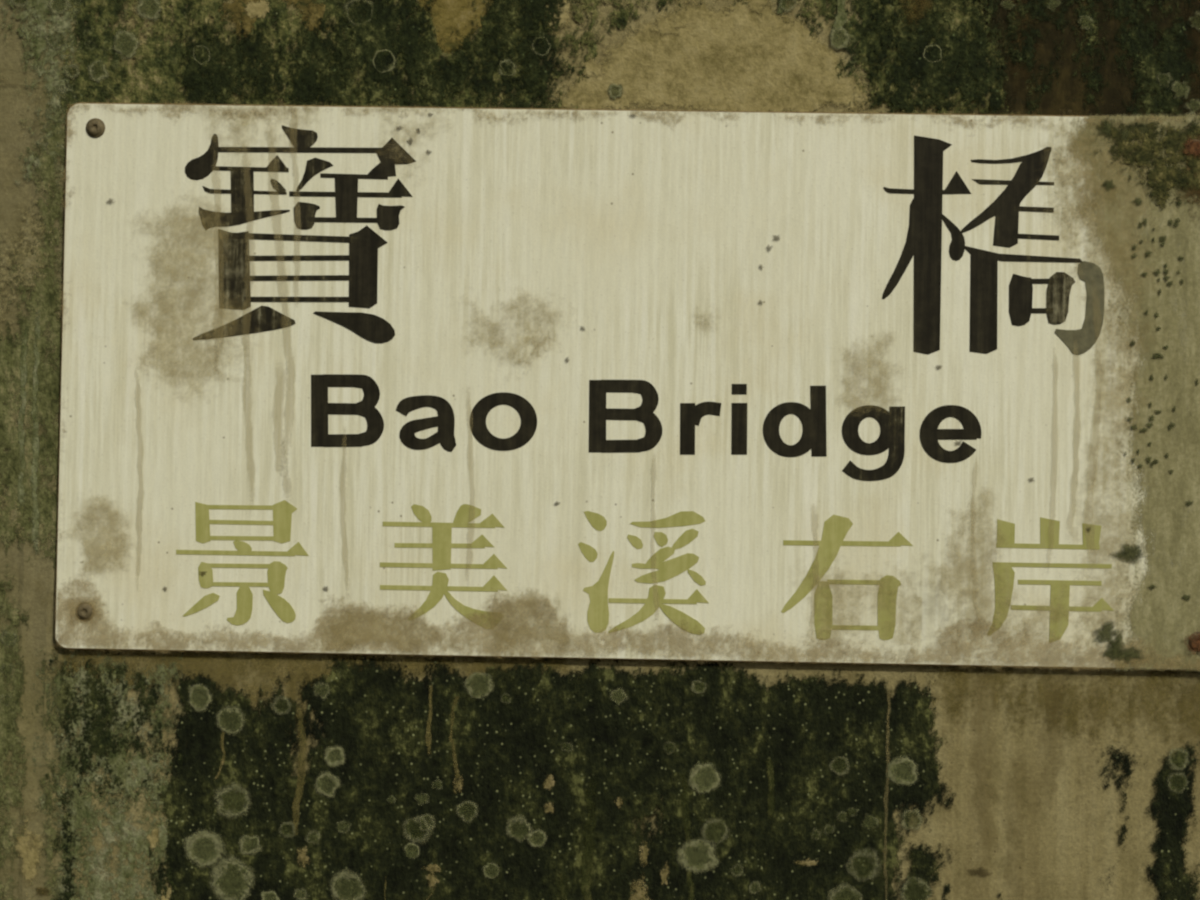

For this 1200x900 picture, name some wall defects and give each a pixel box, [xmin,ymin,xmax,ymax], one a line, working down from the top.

leakage [973,0,1200,117]
leakage [17,311,40,555]
leakage [61,649,567,835]
leakage [935,666,1200,734]